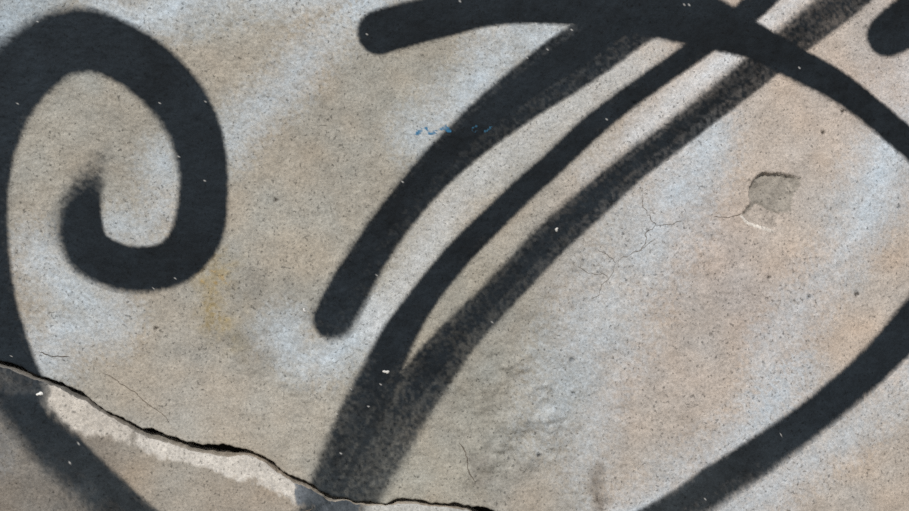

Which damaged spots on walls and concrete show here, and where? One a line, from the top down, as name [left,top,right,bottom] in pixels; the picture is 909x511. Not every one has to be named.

flaking render [739,171,802,234]
crack [106,374,247,452]
crack [453,502,493,511]